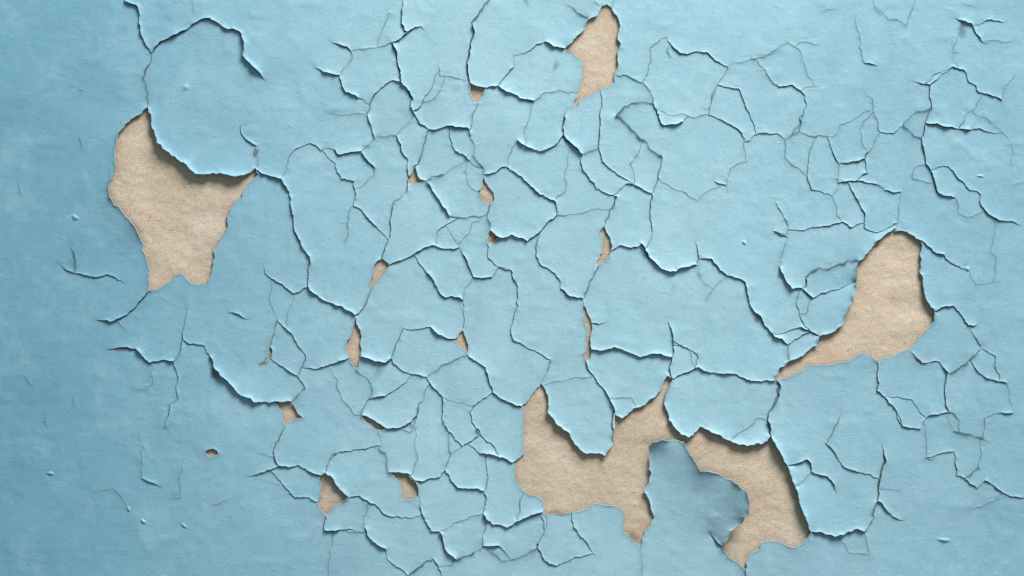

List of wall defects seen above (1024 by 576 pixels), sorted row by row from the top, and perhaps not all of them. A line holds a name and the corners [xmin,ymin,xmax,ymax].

crack [124,0,266,106]
peeling [565,4,625,106]
peeling [104,103,263,291]
crack [59,243,121,281]
crack [240,0,1024,576]
peeling [771,224,938,383]
crack [99,288,273,430]
peeling [269,397,308,425]
crack [139,436,183,499]
peeling [316,467,354,516]
peeling [384,467,422,499]
peeling [514,371,815,576]